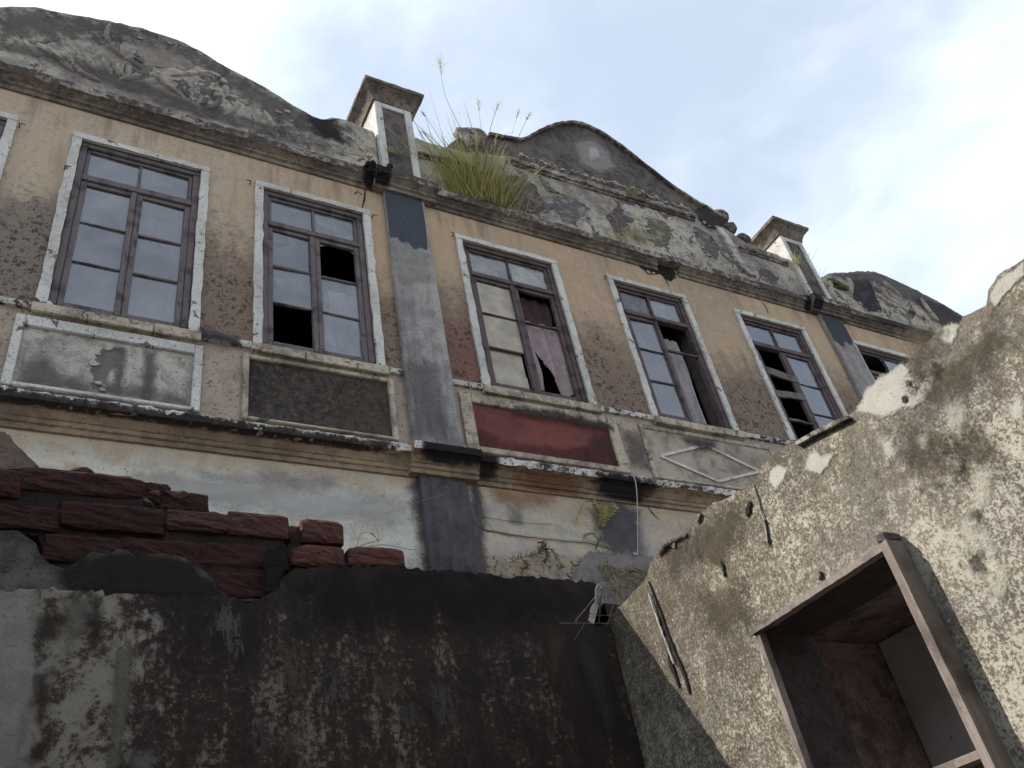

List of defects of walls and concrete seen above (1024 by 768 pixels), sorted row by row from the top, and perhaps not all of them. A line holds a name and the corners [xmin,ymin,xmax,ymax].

peeling [385,191,427,250]
spalling [694,208,724,260]
peeling [990,262,1024,306]
peeling [857,364,935,417]
leakage [322,363,657,628]
crack [745,484,771,547]
peeling [769,465,788,490]
peeling [805,450,833,474]
leakage [36,613,61,639]
leakage [60,551,244,659]
crack [648,581,690,695]
leakage [34,672,50,724]